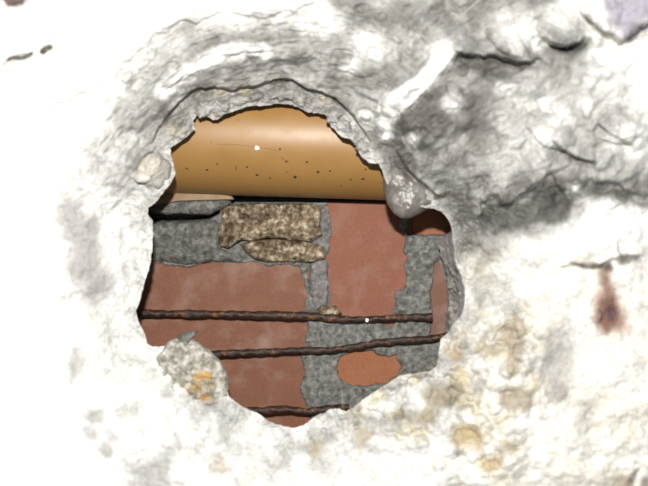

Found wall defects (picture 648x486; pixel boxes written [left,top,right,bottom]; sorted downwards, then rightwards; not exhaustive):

crack [507,54,526,65]
spalling [172,84,370,154]
crack [575,242,638,270]
rust [596,286,624,331]
spalling [502,317,525,375]
spalling [501,389,532,410]